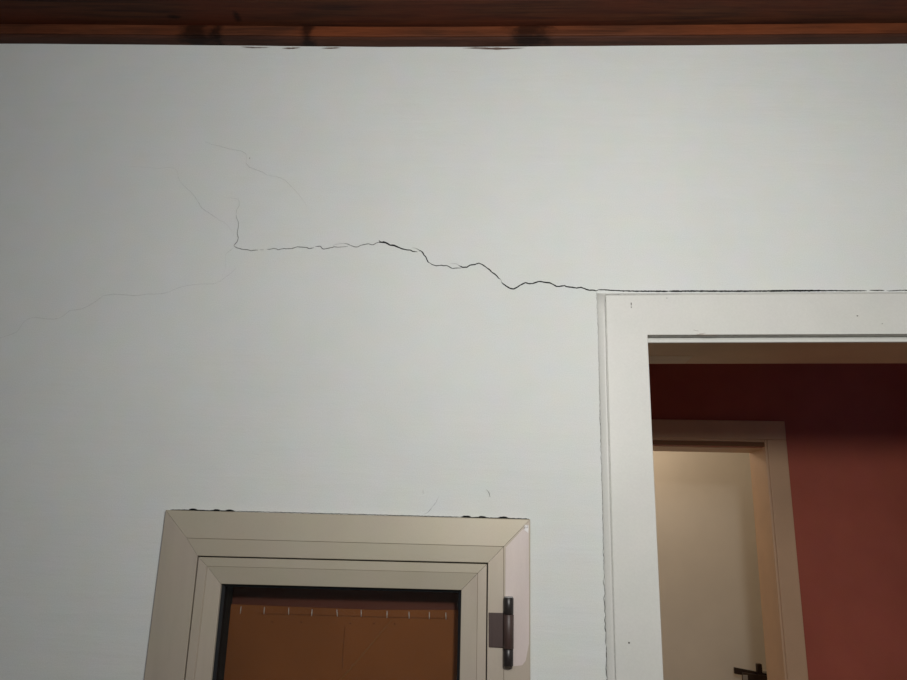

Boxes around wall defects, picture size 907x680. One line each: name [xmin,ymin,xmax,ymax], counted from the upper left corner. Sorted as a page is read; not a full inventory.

crack [234,234,907,295]